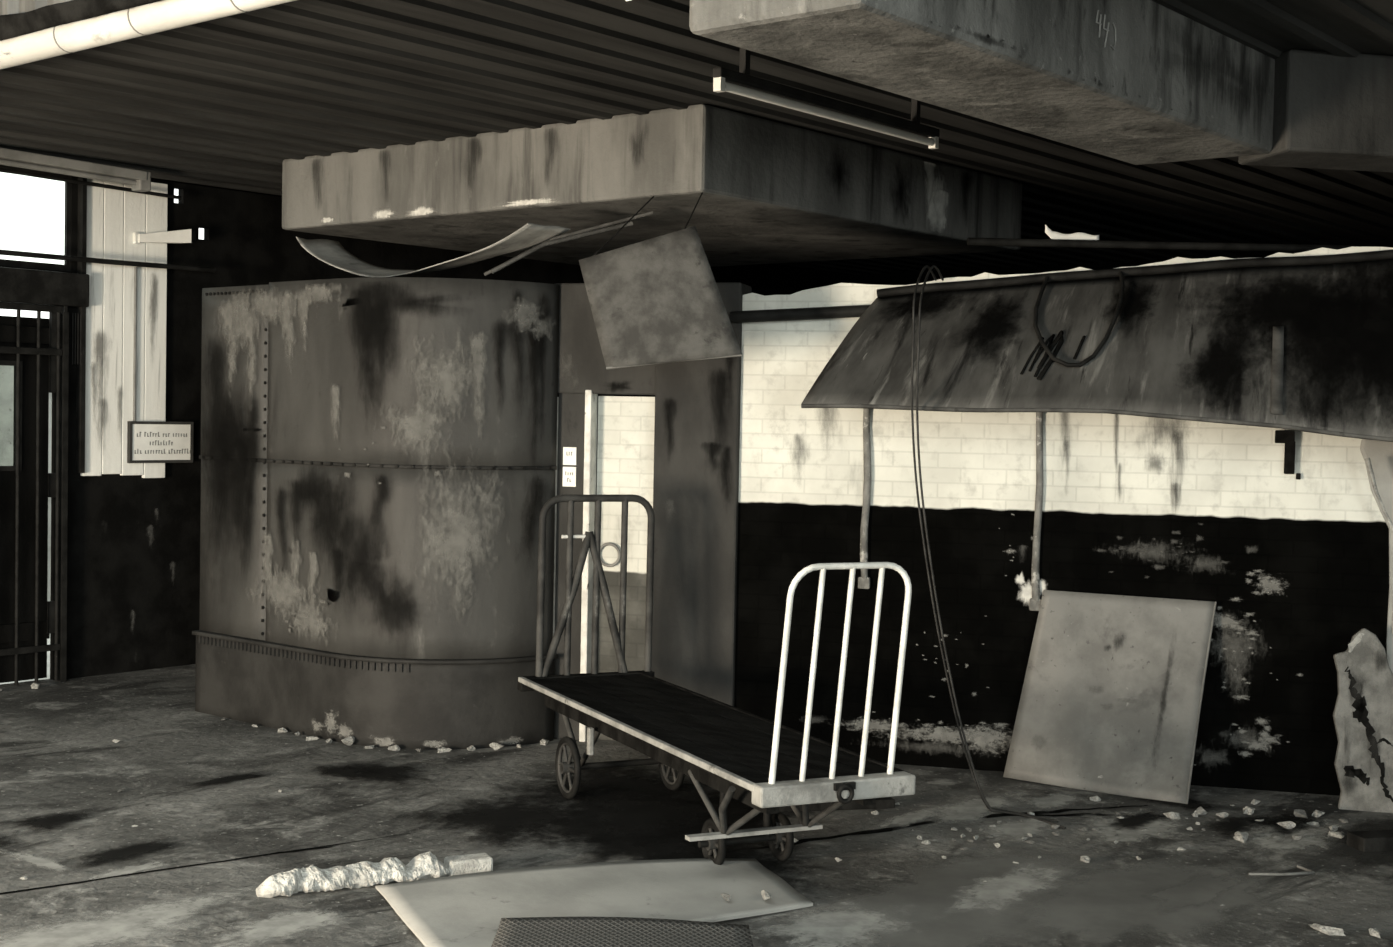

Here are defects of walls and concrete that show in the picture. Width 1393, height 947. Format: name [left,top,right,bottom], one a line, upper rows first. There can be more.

spalling [375,210,393,219]
spalling [410,207,433,216]
water stain [1155,420,1181,461]